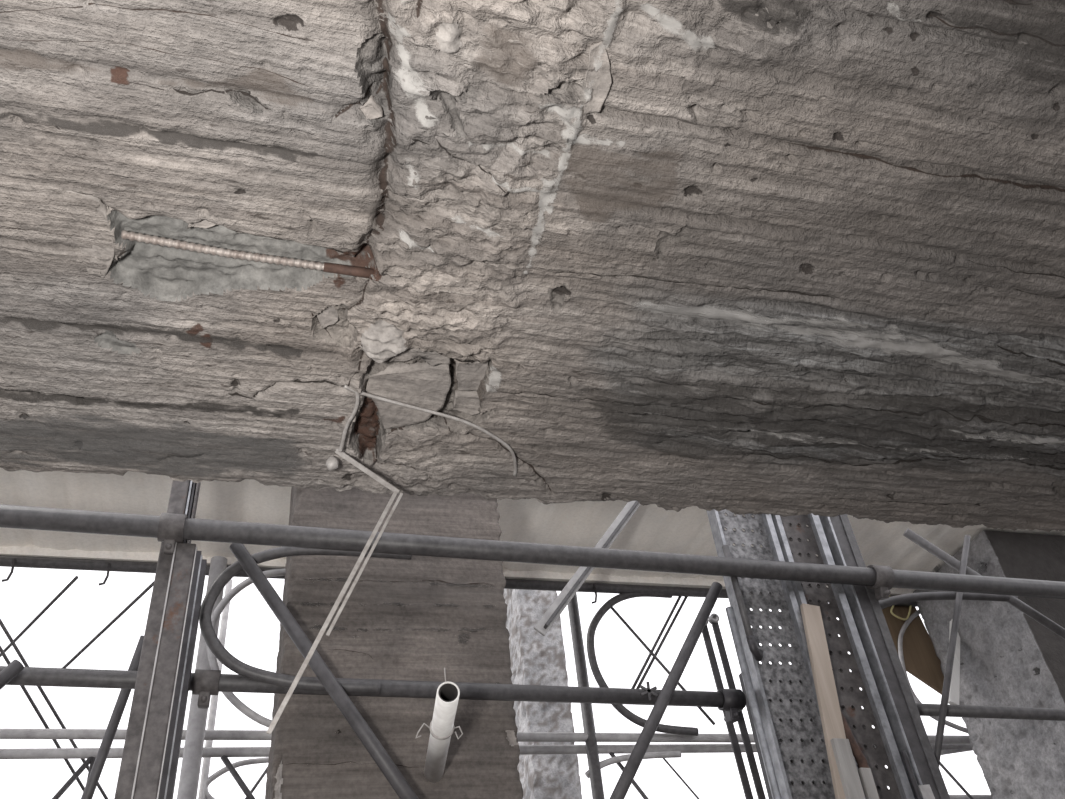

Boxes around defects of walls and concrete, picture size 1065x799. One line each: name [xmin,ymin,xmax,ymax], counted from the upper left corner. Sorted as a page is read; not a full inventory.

crack [19,40,318,110]
spalling [354,32,393,127]
crack [333,0,506,254]
spalling [429,85,481,138]
leakage [469,90,625,274]
crack [779,141,1065,192]
spalling [66,190,380,302]
crack [229,335,372,399]
rust [324,397,379,459]
spalling [348,348,497,465]
leakage [486,366,501,392]
leakage [637,302,1065,385]